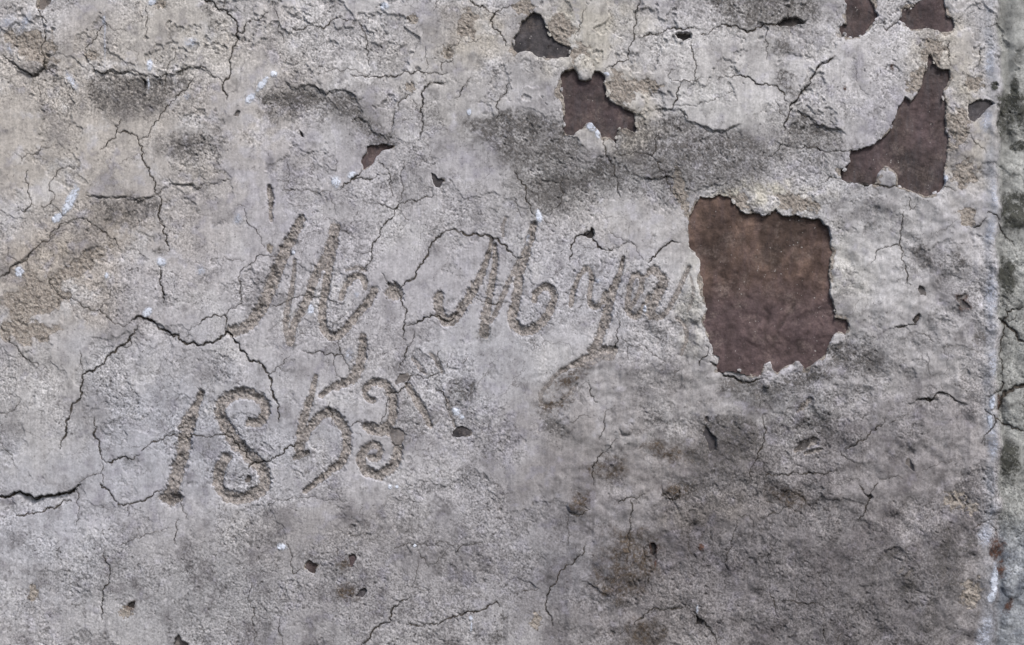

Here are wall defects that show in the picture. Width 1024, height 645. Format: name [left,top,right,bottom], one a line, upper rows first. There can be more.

crack [0,49,349,618]
crack [204,0,510,136]
flaking render [361,144,395,170]
crack [278,160,516,437]
flaking render [509,0,665,143]
crack [569,231,680,262]
crack [607,1,859,157]
flaking render [672,166,850,378]
flaking render [835,0,993,198]
flaking render [958,207,976,227]
crack [687,300,1024,569]
crack [362,509,590,644]